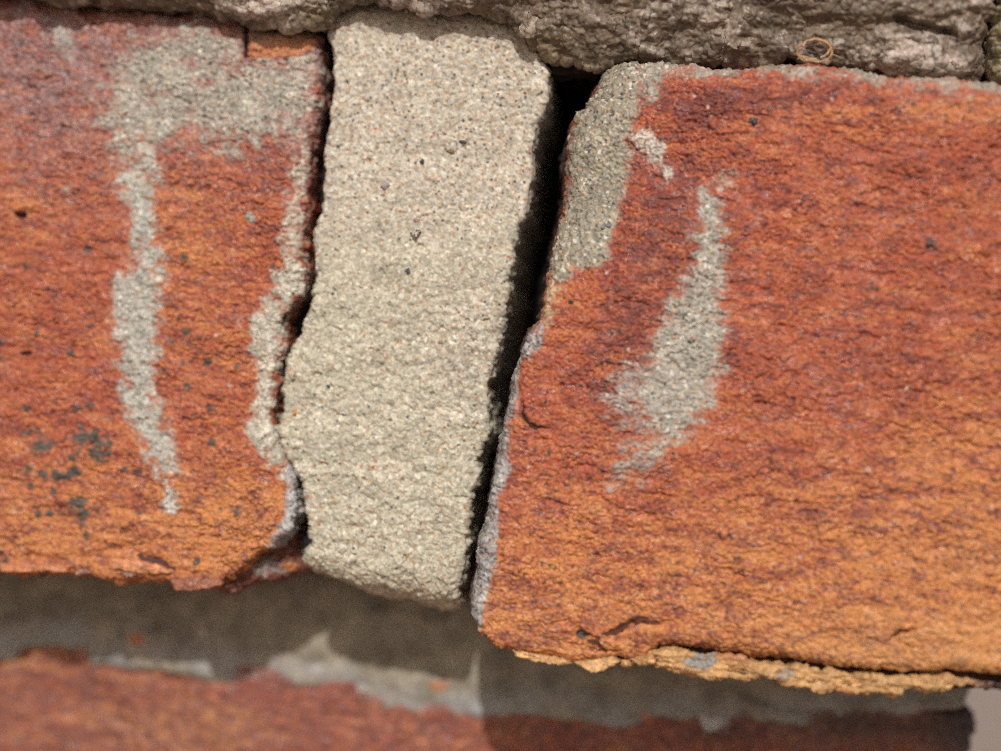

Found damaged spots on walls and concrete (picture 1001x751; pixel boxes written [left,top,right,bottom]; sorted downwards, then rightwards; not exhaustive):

crack [316,31,335,226]
crack [518,65,602,360]
crack [292,300,312,338]
crack [521,404,551,430]
crack [297,520,312,557]
spalling [512,643,1001,699]